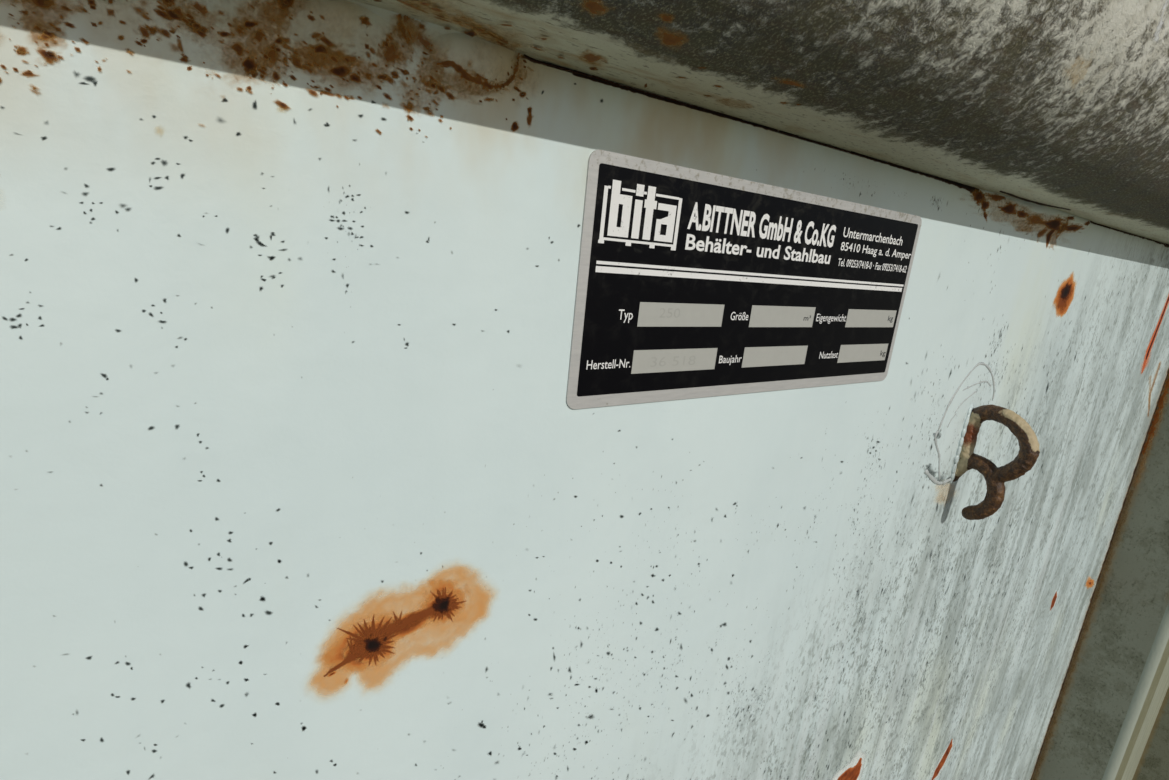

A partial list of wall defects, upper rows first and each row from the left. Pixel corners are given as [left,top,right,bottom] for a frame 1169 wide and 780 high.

corrosion [0,0,1169,248]
corrosion [1054,274,1075,317]
corrosion [312,567,491,694]
corrosion [1030,295,1169,780]